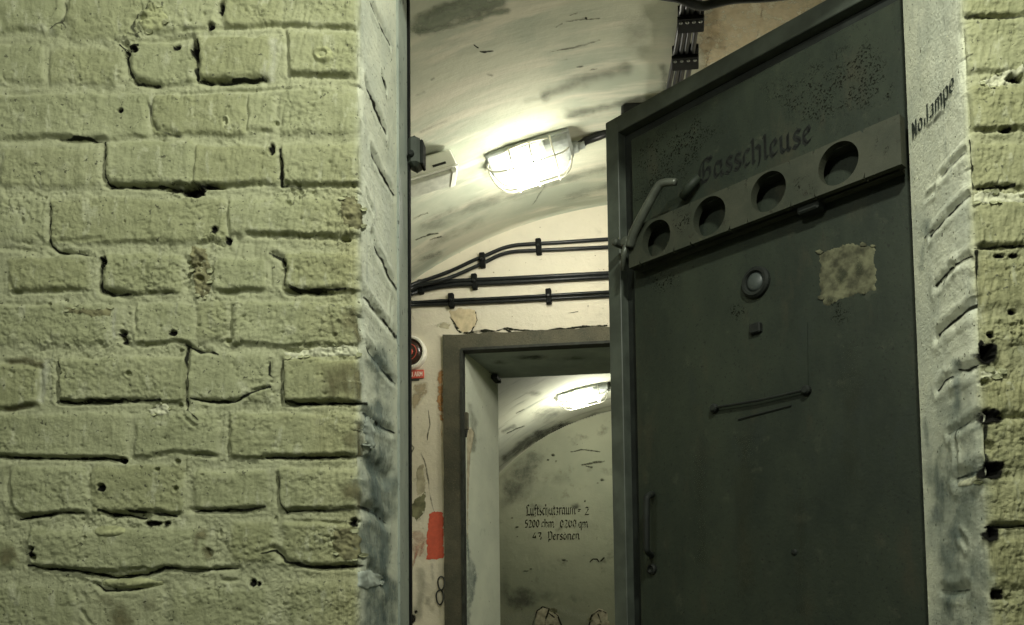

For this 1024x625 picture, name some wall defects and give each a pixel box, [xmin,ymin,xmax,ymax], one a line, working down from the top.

spalling [338,194,367,230]
spalling [436,308,536,333]
spalling [412,492,426,520]